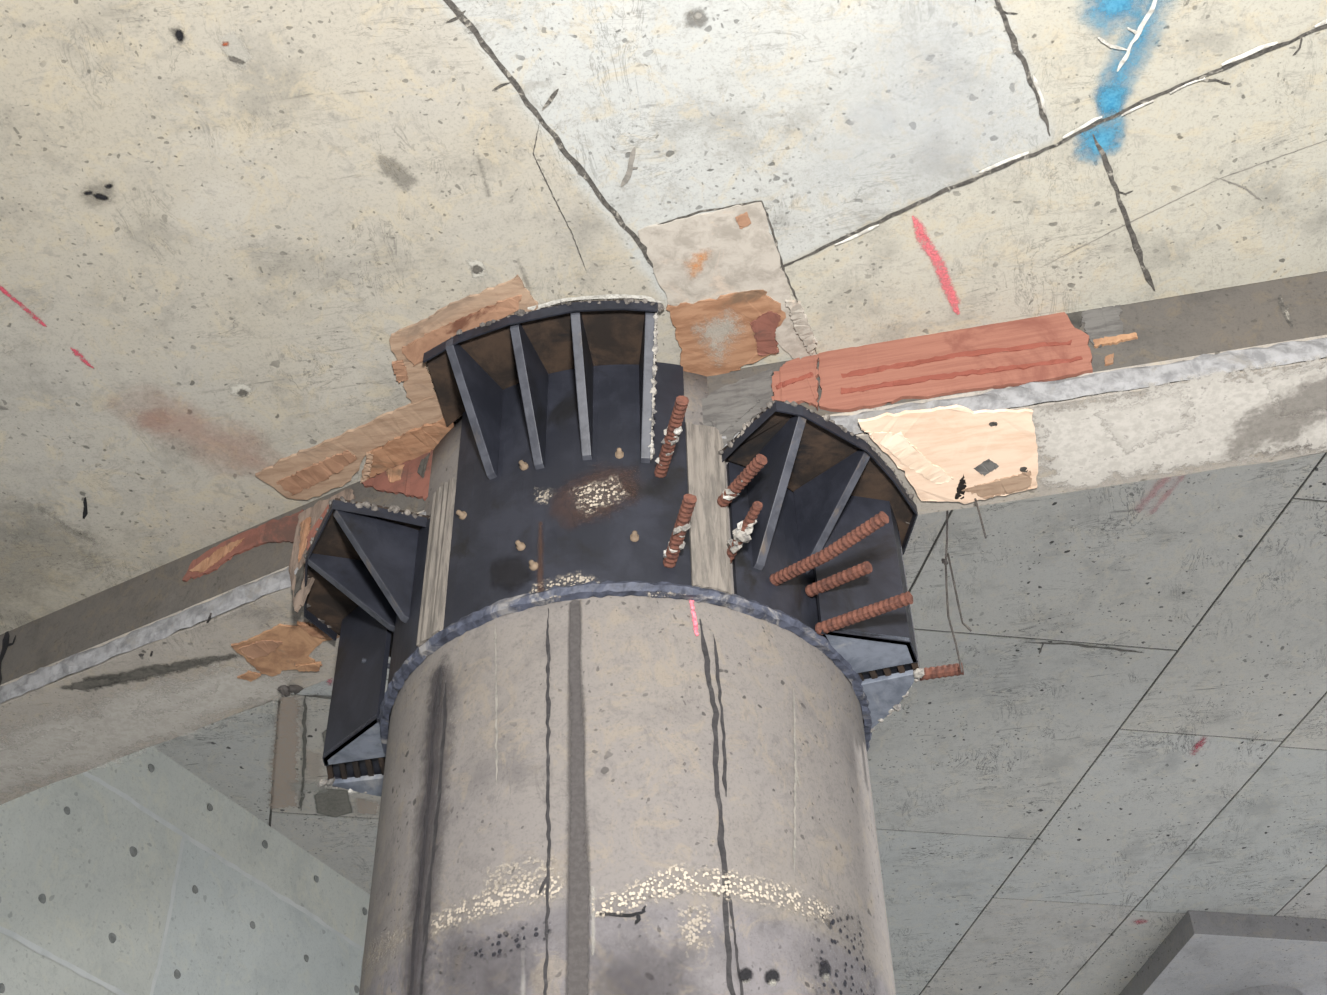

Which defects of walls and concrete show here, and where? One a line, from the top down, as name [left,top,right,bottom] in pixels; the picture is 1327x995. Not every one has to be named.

crack [443,0,1327,302]
peeling [735,212,751,229]
peeling [392,295,522,383]
peeling [750,311,781,356]
spalling [229,384,254,397]
peeling [276,450,357,495]
peeling [182,509,304,582]
crack [538,608,551,995]
crack [699,619,744,995]